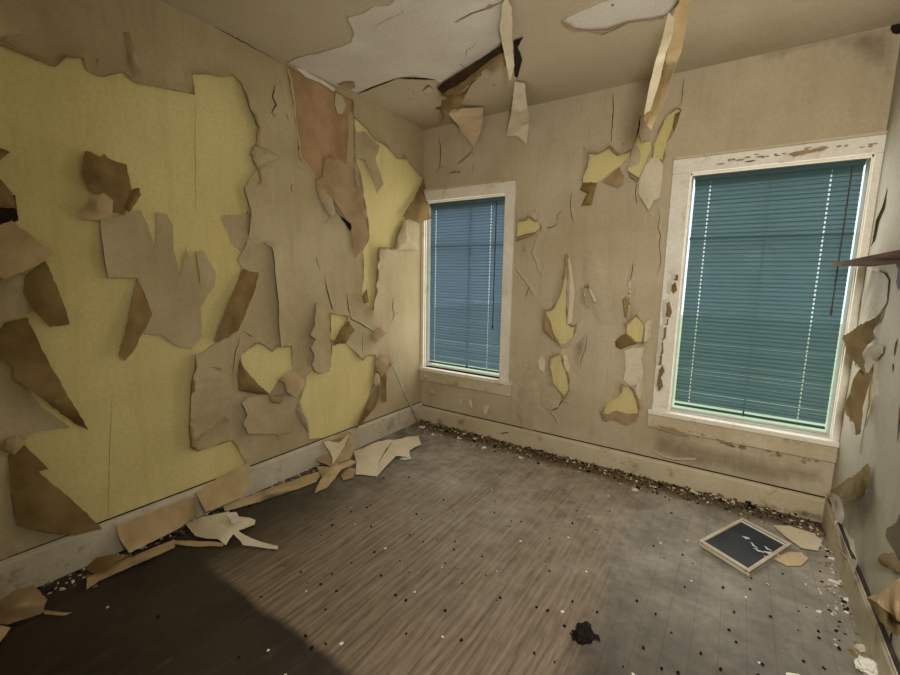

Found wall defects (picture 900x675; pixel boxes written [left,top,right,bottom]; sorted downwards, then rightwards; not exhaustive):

peeling [0,0,529,560]
peeling [515,208,563,241]
peeling [538,253,597,424]
peeling [559,0,691,210]
peeling [596,260,678,427]
peeling [718,143,878,165]
peeling [827,270,889,574]
peeling [867,514,900,641]